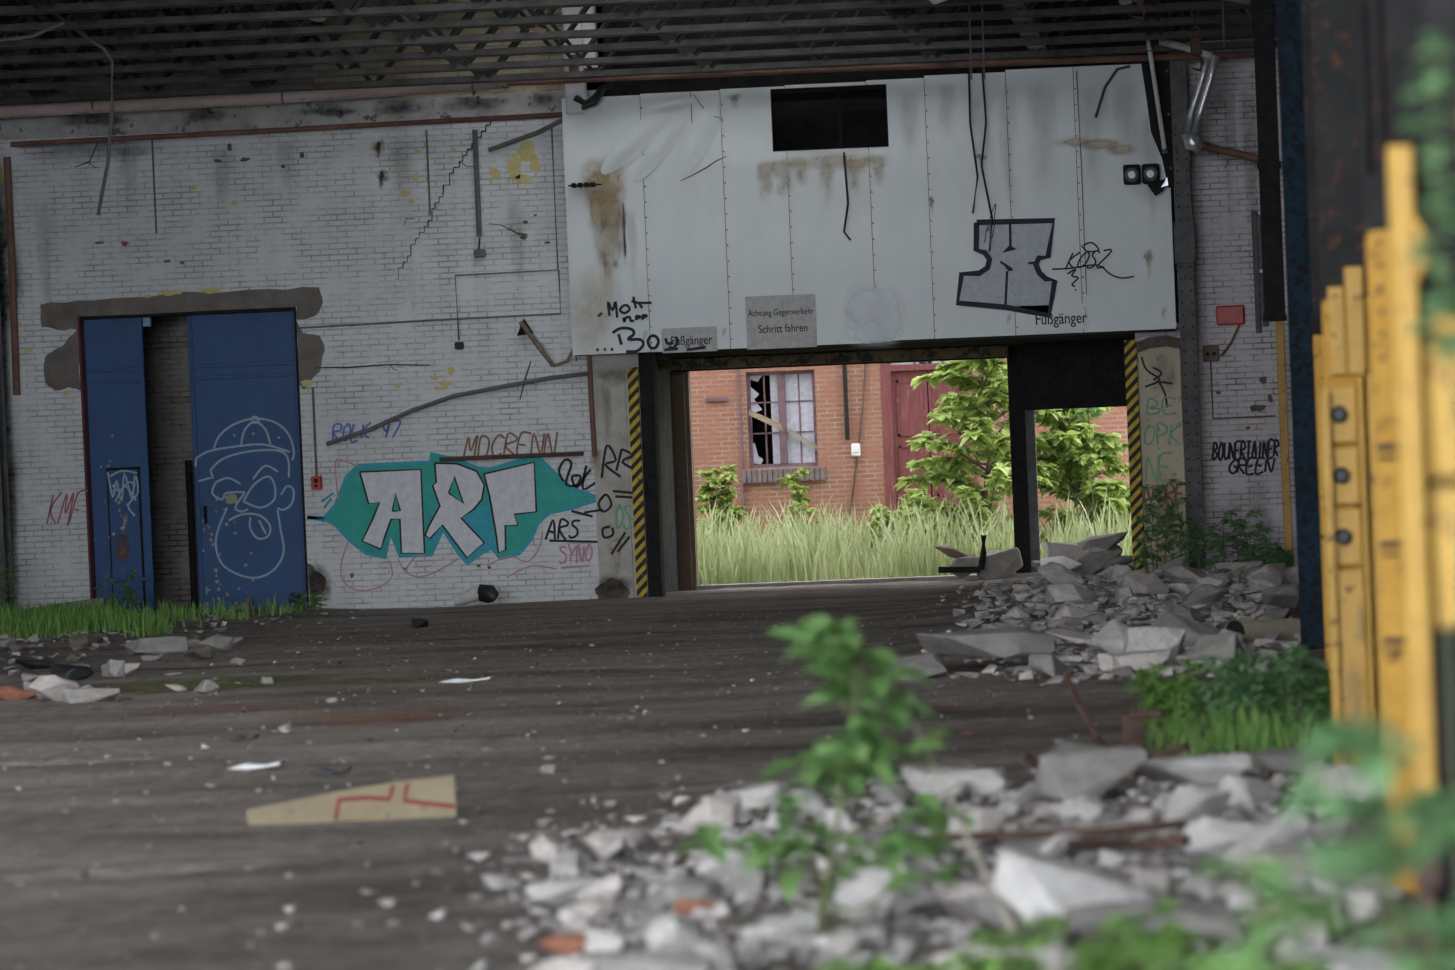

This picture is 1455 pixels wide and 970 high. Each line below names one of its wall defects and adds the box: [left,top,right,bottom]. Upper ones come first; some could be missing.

crack [395,121,491,280]
rust [587,170,621,241]
spalling [18,286,325,396]